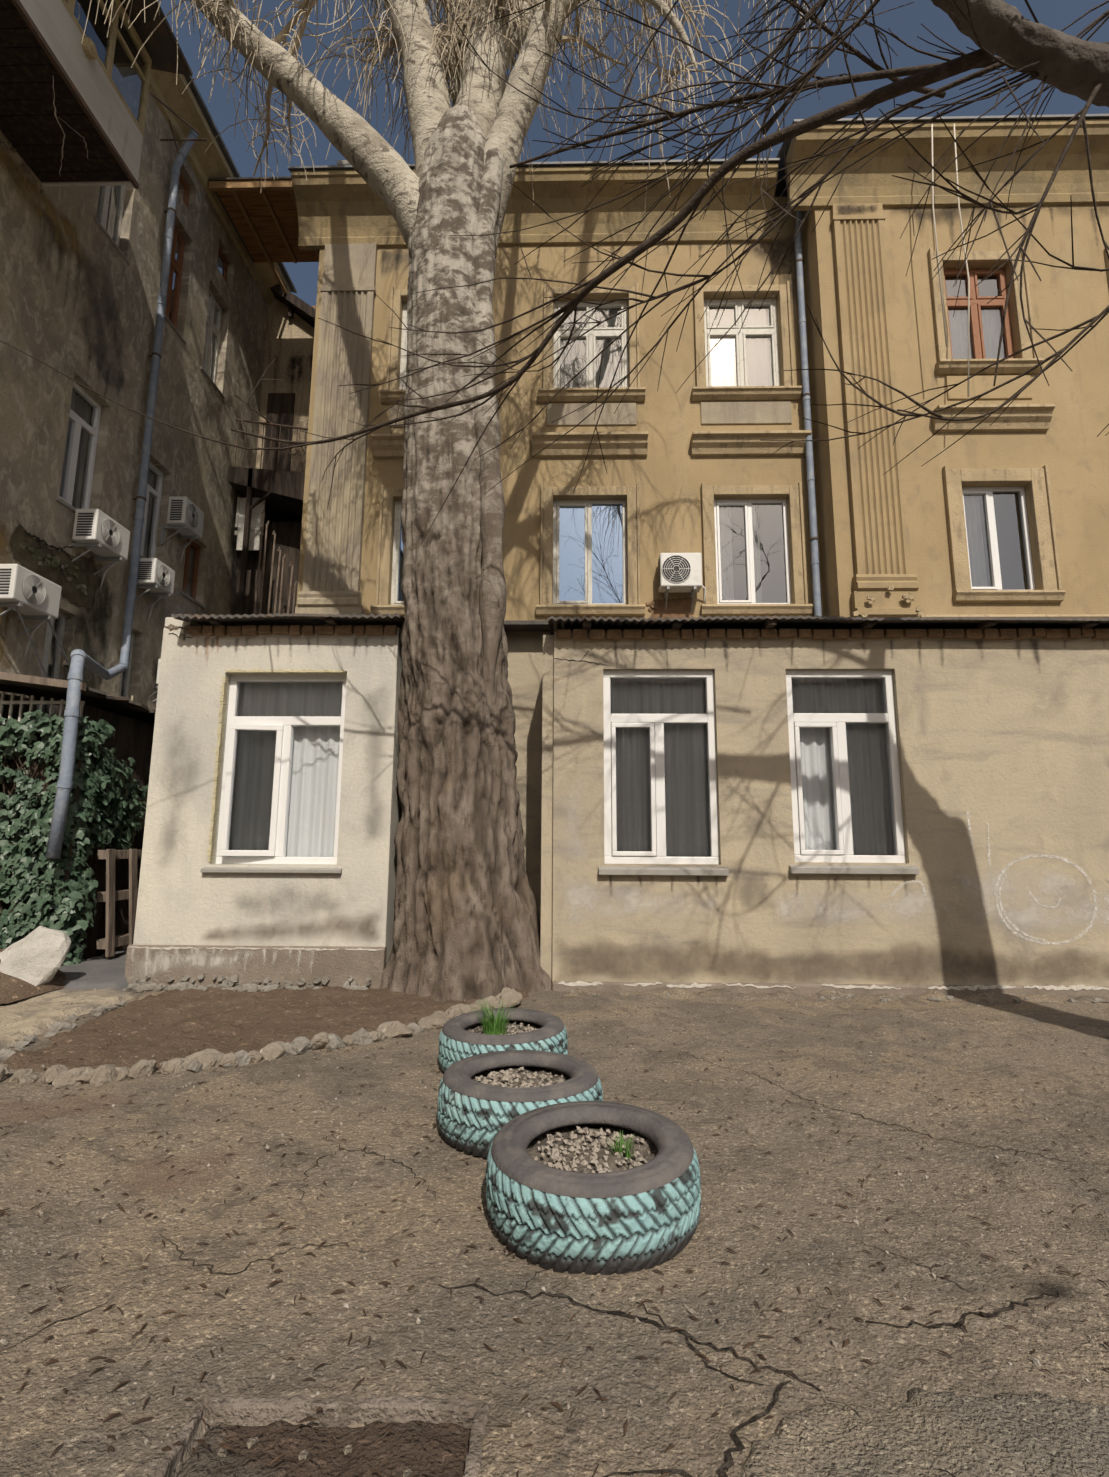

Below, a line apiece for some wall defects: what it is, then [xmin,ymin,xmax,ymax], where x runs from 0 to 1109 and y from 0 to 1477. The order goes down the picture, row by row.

leakage [708,951,1085,981]